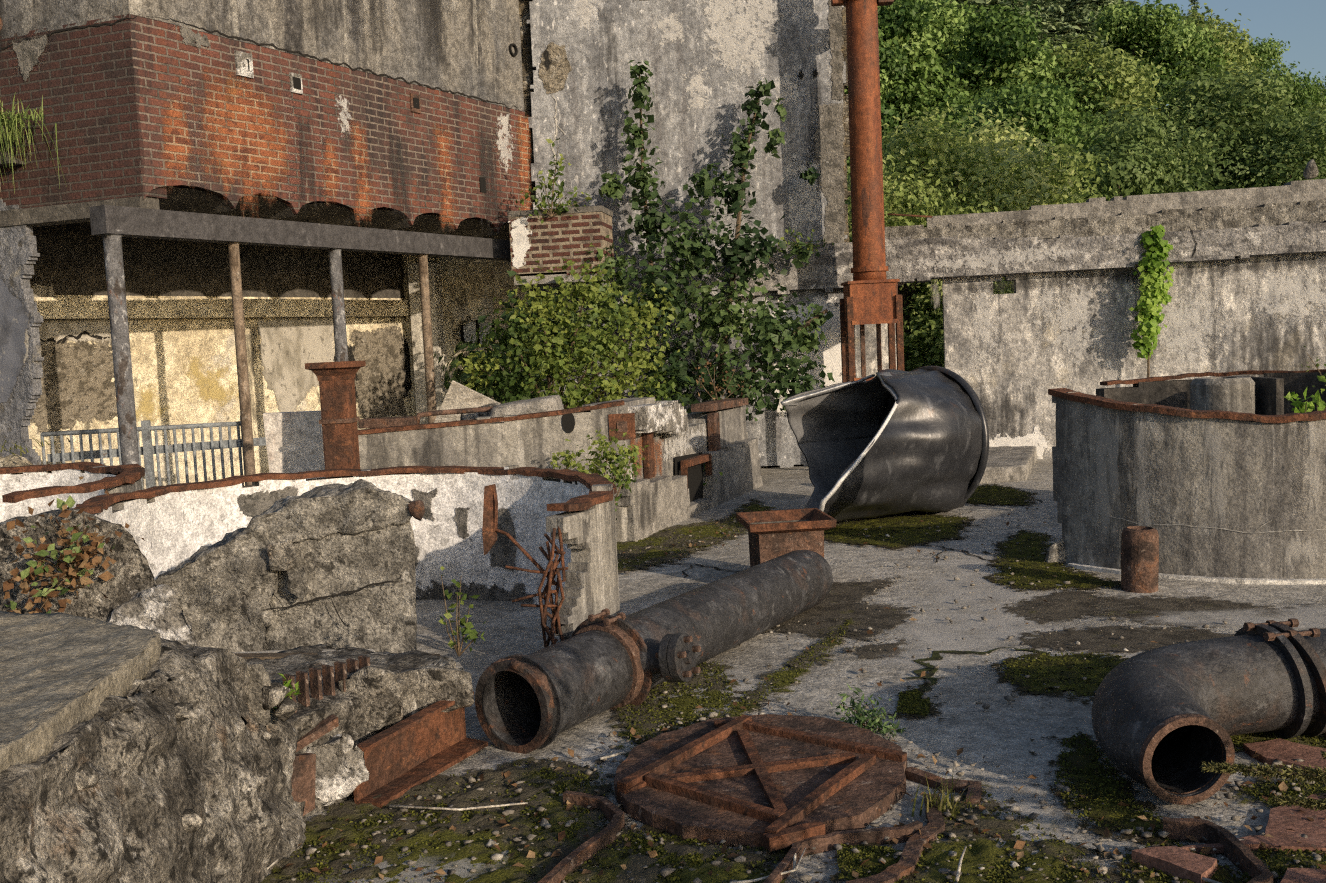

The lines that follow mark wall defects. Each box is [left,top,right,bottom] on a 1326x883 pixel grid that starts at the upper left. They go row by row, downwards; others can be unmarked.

rust [164,100,191,174]
rust [204,76,287,200]
rust [354,124,371,215]
rust [436,129,454,222]
leakage [894,243,1093,313]
spalling [30,319,118,433]
leakage [1244,331,1312,377]
leakage [981,399,1023,437]
peeling [238,486,298,517]
peeling [412,488,438,521]
peeling [453,503,473,539]
leakage [1090,412,1150,535]